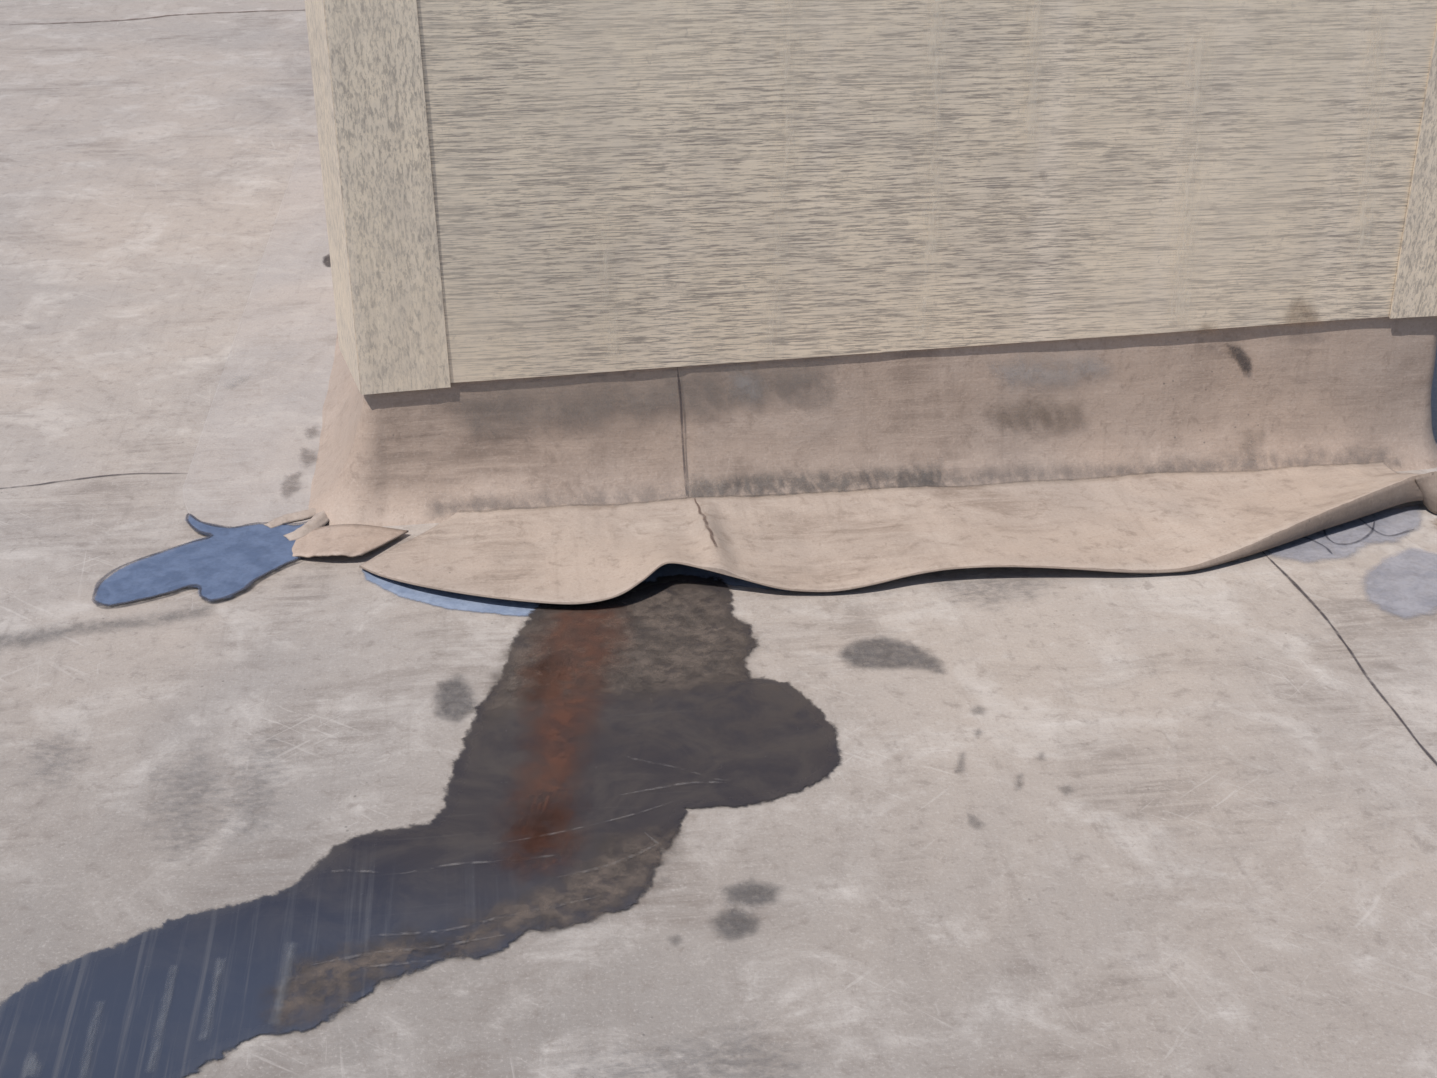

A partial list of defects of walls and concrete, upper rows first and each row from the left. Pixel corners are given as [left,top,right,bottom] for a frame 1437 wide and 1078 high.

damp [1228,346,1251,372]
crack [678,374,717,547]
peeling [92,513,308,606]
damp [844,639,938,668]
damp [0,574,841,1078]